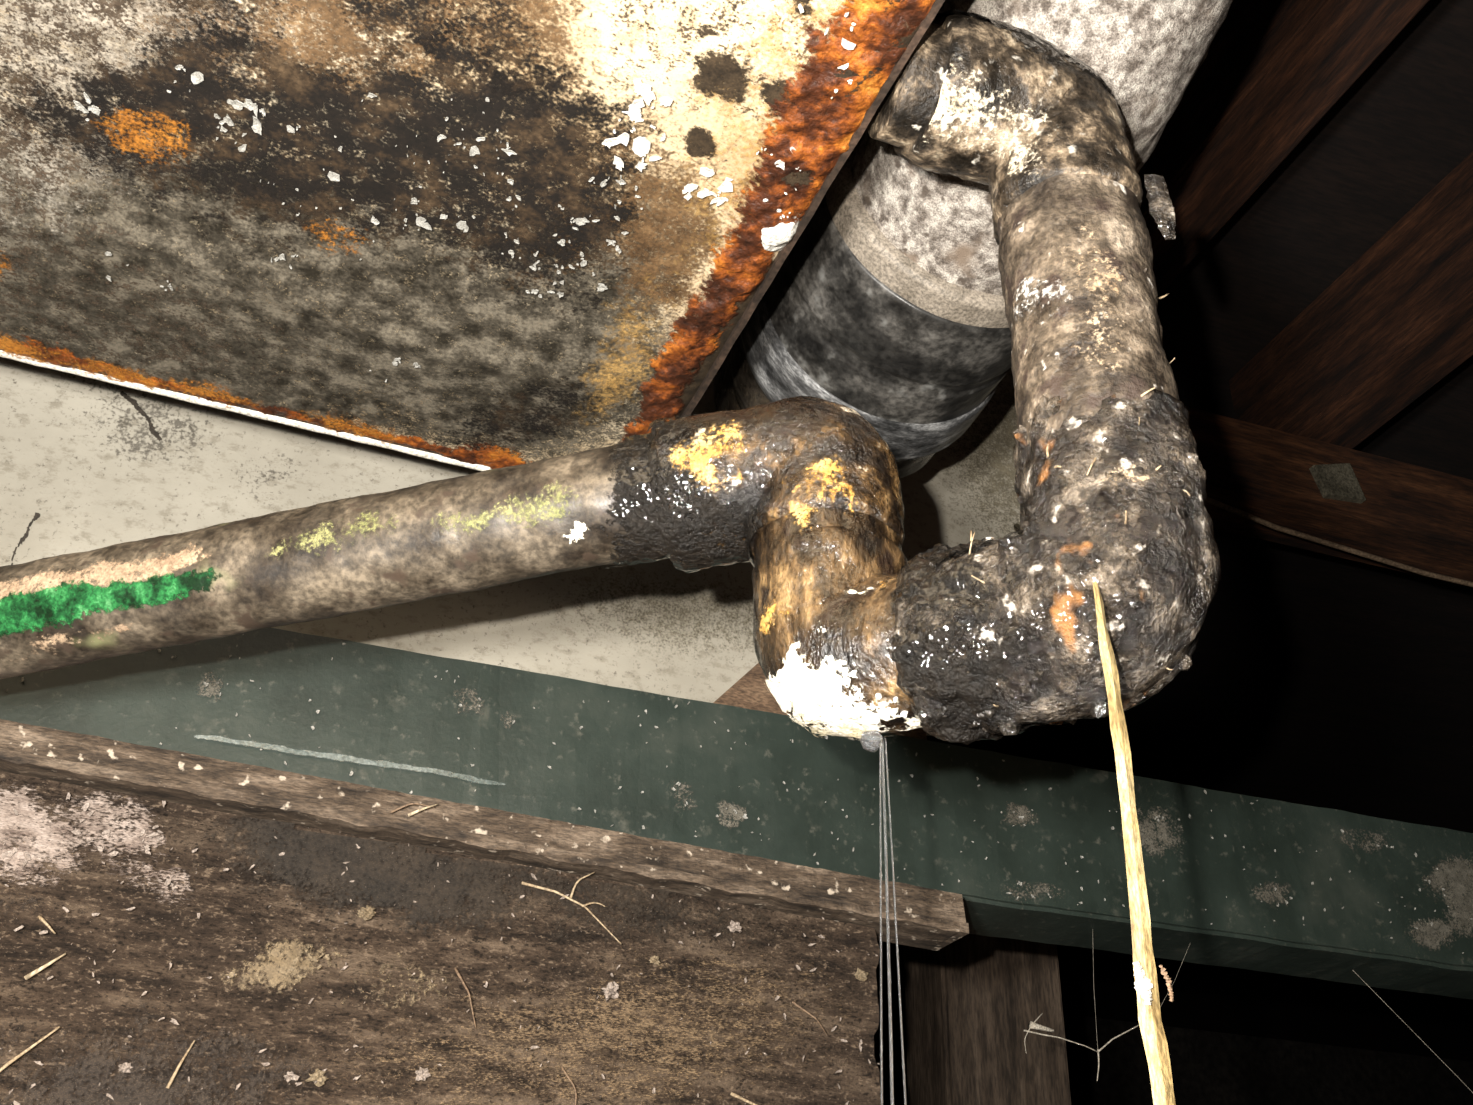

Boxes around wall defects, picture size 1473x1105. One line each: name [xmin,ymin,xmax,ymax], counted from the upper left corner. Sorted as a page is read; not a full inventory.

corrosion [102,108,190,161]
leakage [689,24,795,116]
leakage [0,0,749,463]
corrosion [593,0,935,443]
corrosion [0,336,532,469]
leakage [0,1004,328,1105]